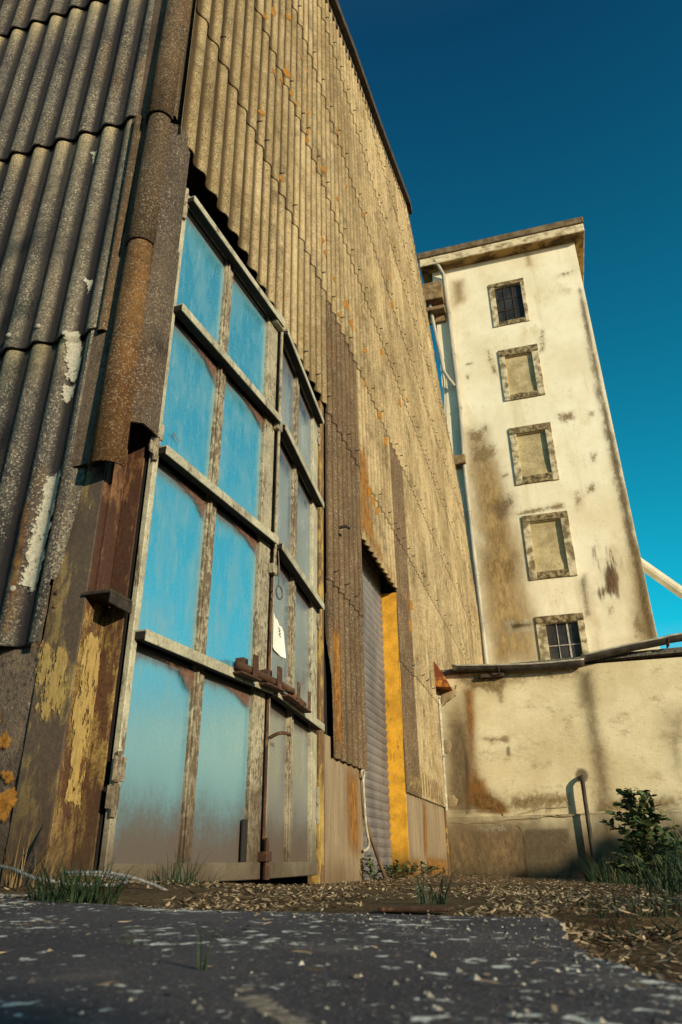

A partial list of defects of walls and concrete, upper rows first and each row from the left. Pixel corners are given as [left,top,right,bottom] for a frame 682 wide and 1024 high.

peeling [61,384,76,403]
damp [470,427,563,664]
damp [598,556,619,598]
peeling [34,632,100,810]
rust [348,773,359,848]
damp [452,709,476,813]